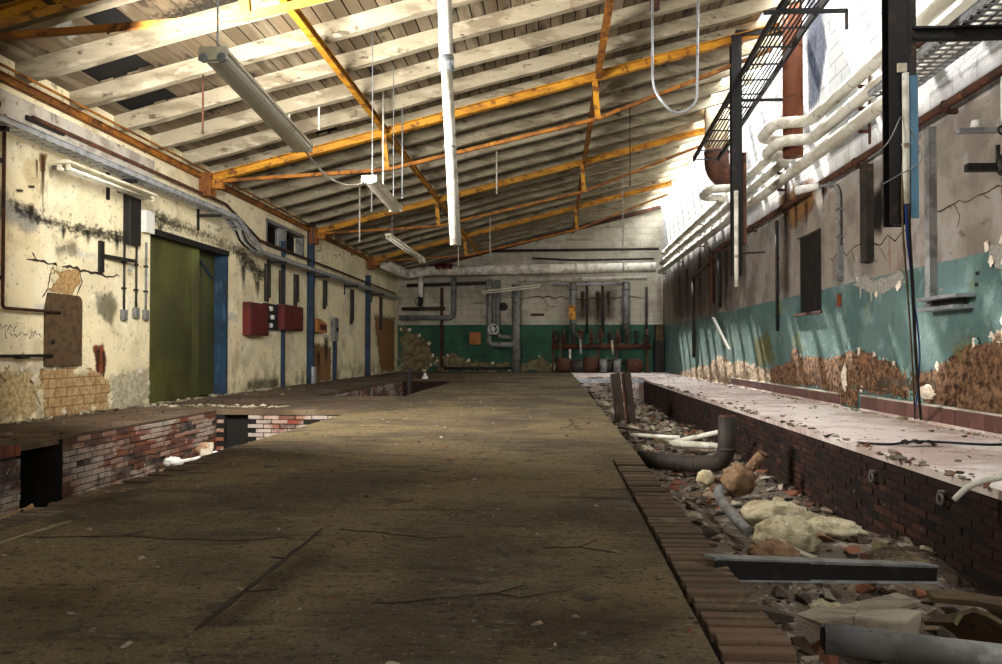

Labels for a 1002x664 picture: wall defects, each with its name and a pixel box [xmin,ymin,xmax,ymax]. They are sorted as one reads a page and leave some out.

leakage [10,199,123,247]
peeling [854,271,906,299]
peeling [984,235,1002,279]
flaking render [675,314,1002,414]
flaking render [0,365,150,422]
spalling [643,382,1002,597]
crack [25,528,461,664]